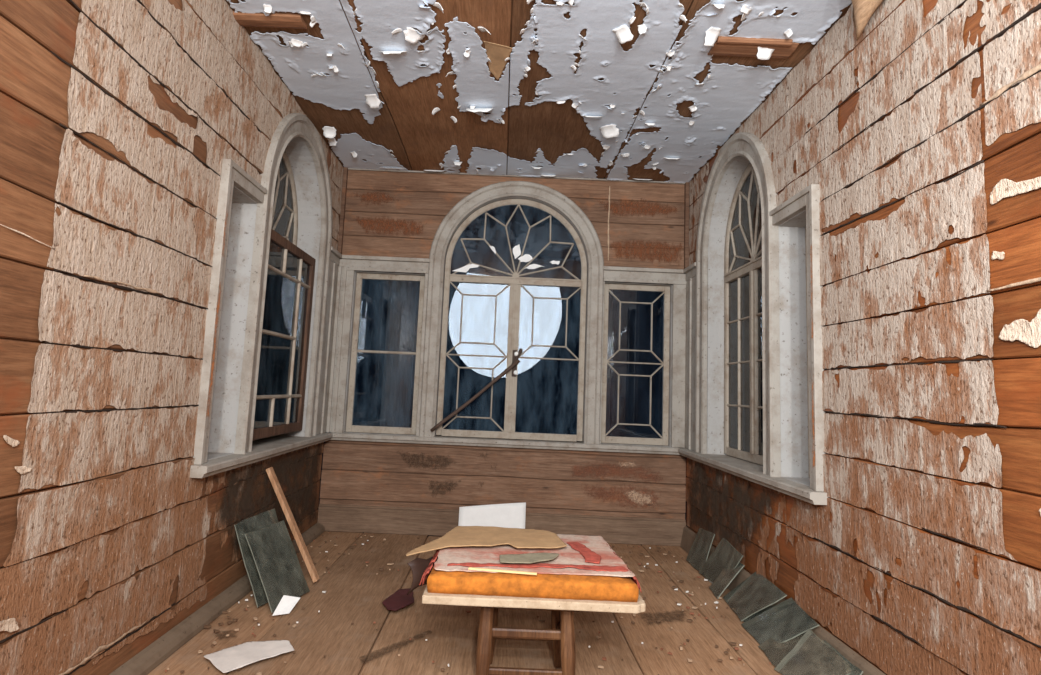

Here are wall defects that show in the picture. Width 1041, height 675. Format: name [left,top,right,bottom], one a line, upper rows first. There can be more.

peeling [0,0,446,675]
peeling [425,145,462,173]
peeling [444,0,1041,675]